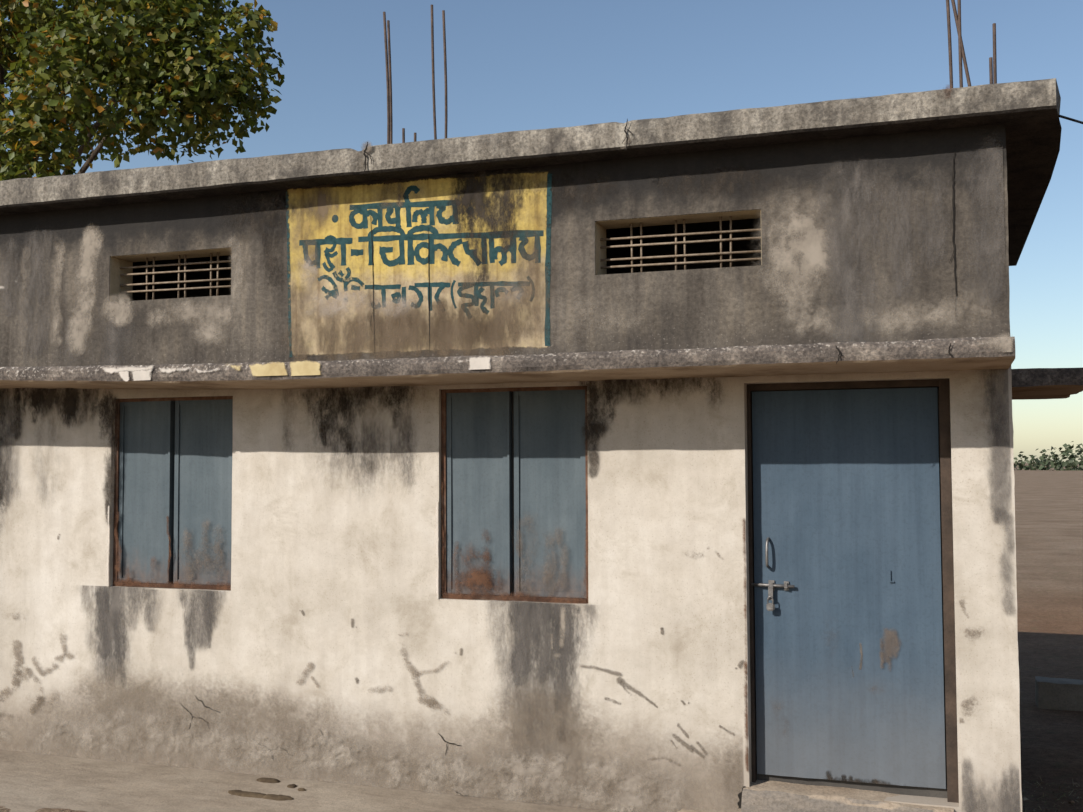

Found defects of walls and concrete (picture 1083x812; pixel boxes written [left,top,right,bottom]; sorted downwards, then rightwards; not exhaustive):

leakage [0,388,119,525]
leakage [303,386,412,467]
leakage [581,377,700,477]
rust [441,481,584,604]
leakage [96,586,154,676]
leakage [2,590,613,808]